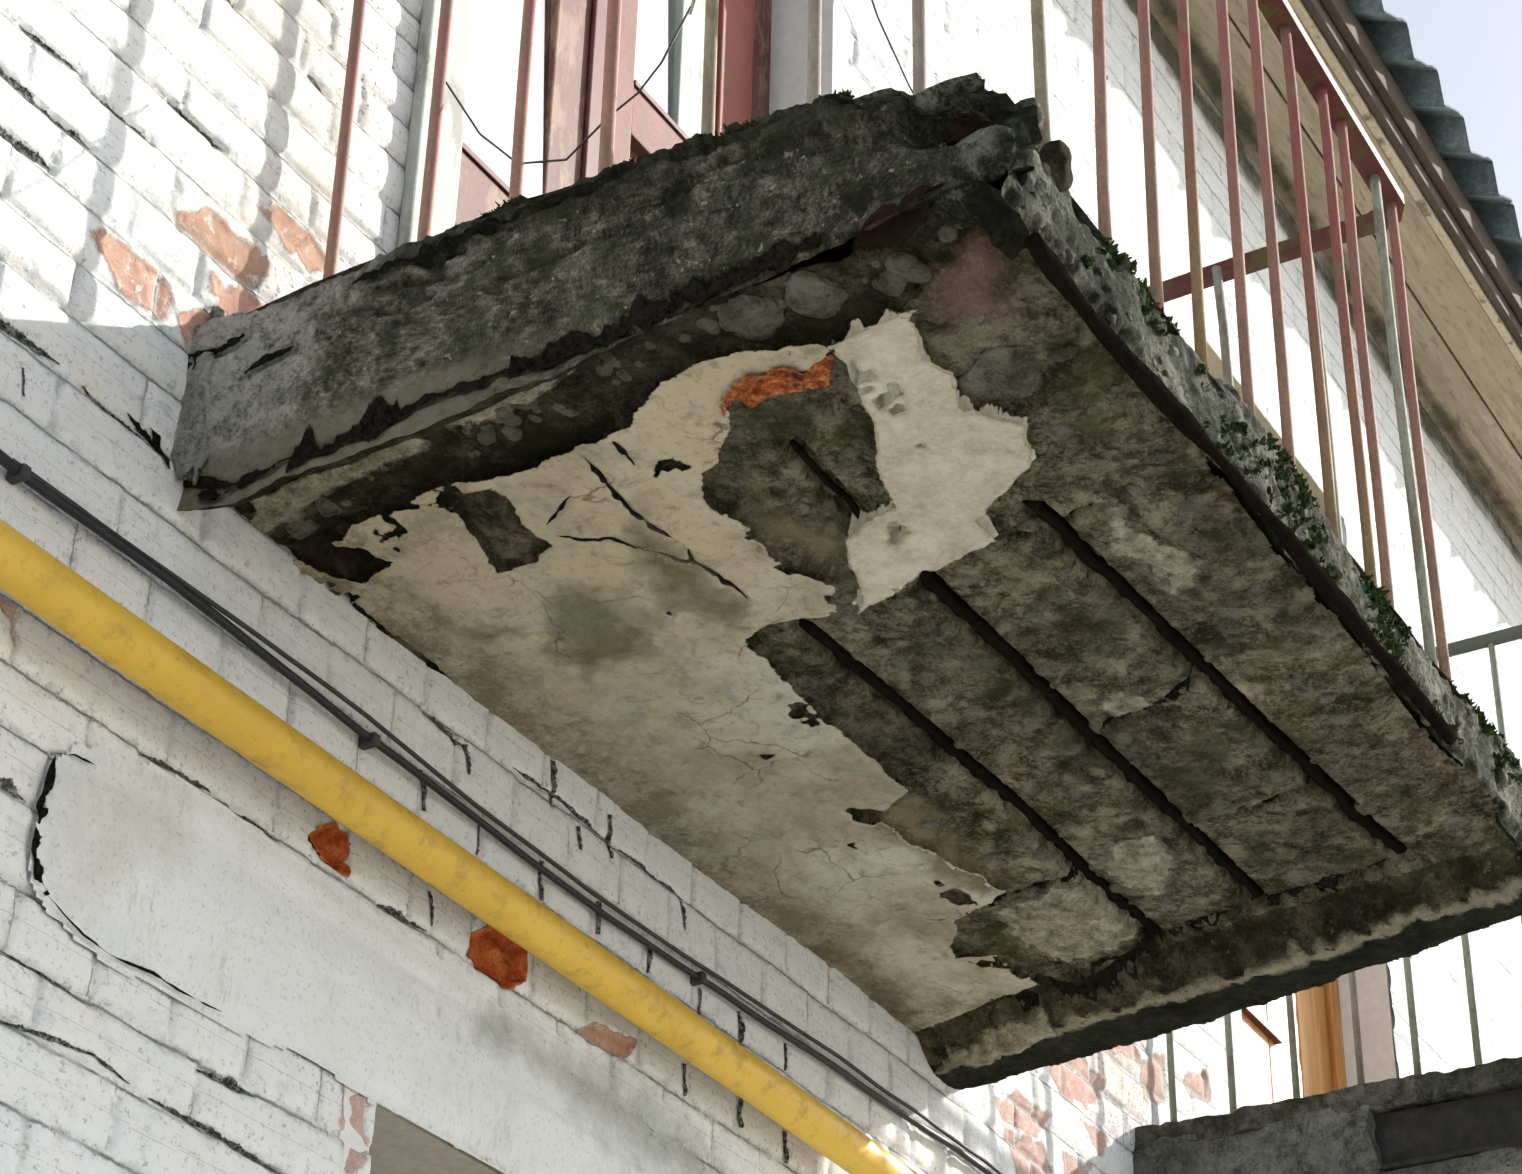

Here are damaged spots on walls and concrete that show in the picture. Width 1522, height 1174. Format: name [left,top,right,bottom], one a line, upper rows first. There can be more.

damp [1126,0,1314,239]
peeling [92,205,271,349]
rust [720,355,837,417]
damp [1313,254,1522,561]
crack [547,441,747,598]
spalling [233,183,1510,990]
crack [31,753,222,1012]
damp [1039,878,1522,1041]
spalling [576,1022,637,1058]
damp [933,1050,962,1074]
peeling [995,1057,1110,1174]
peeling [1111,1044,1166,1105]